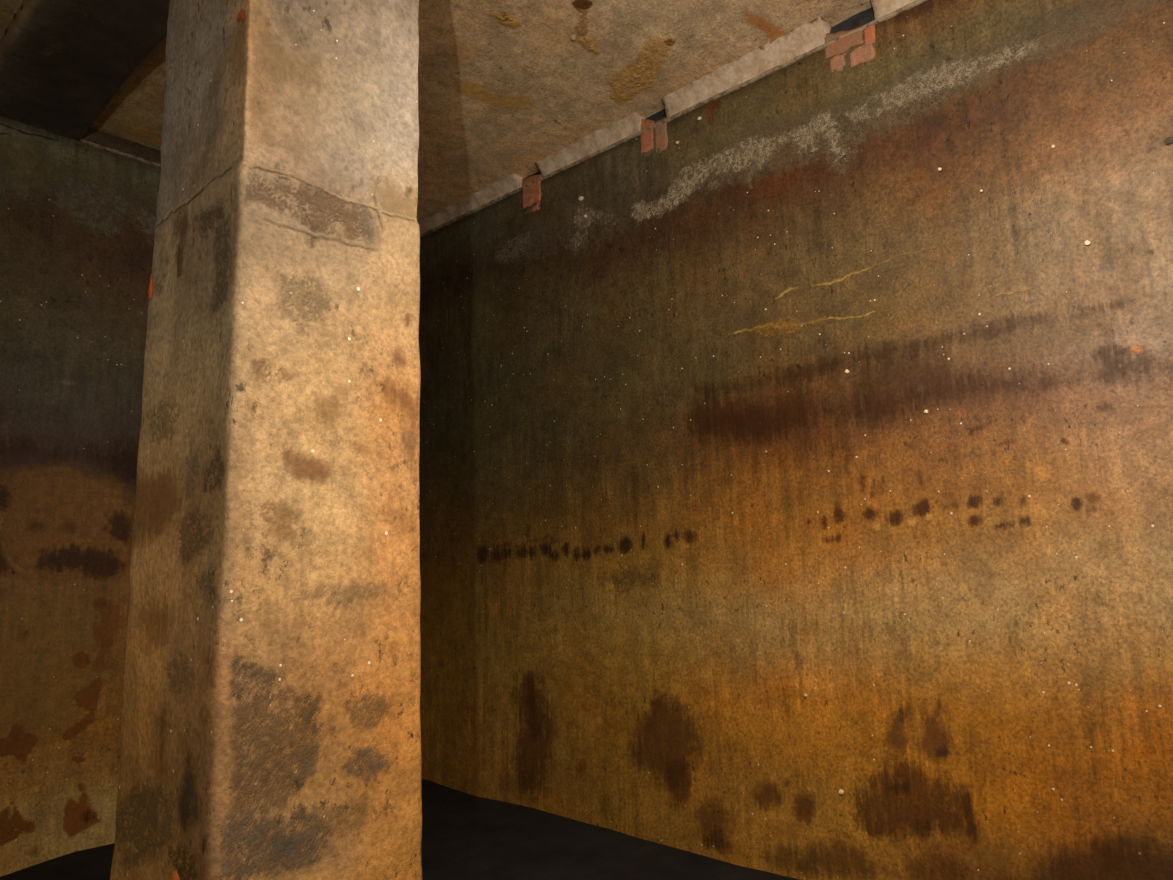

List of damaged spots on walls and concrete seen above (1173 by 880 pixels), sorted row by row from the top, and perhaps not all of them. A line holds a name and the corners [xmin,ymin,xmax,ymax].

spalling [571,0,602,56]
spalling [607,35,675,105]
flaking render [824,25,875,74]
flaking render [640,117,679,158]
leakage [631,0,1158,221]
leakage [477,534,645,563]
leakage [222,656,332,880]